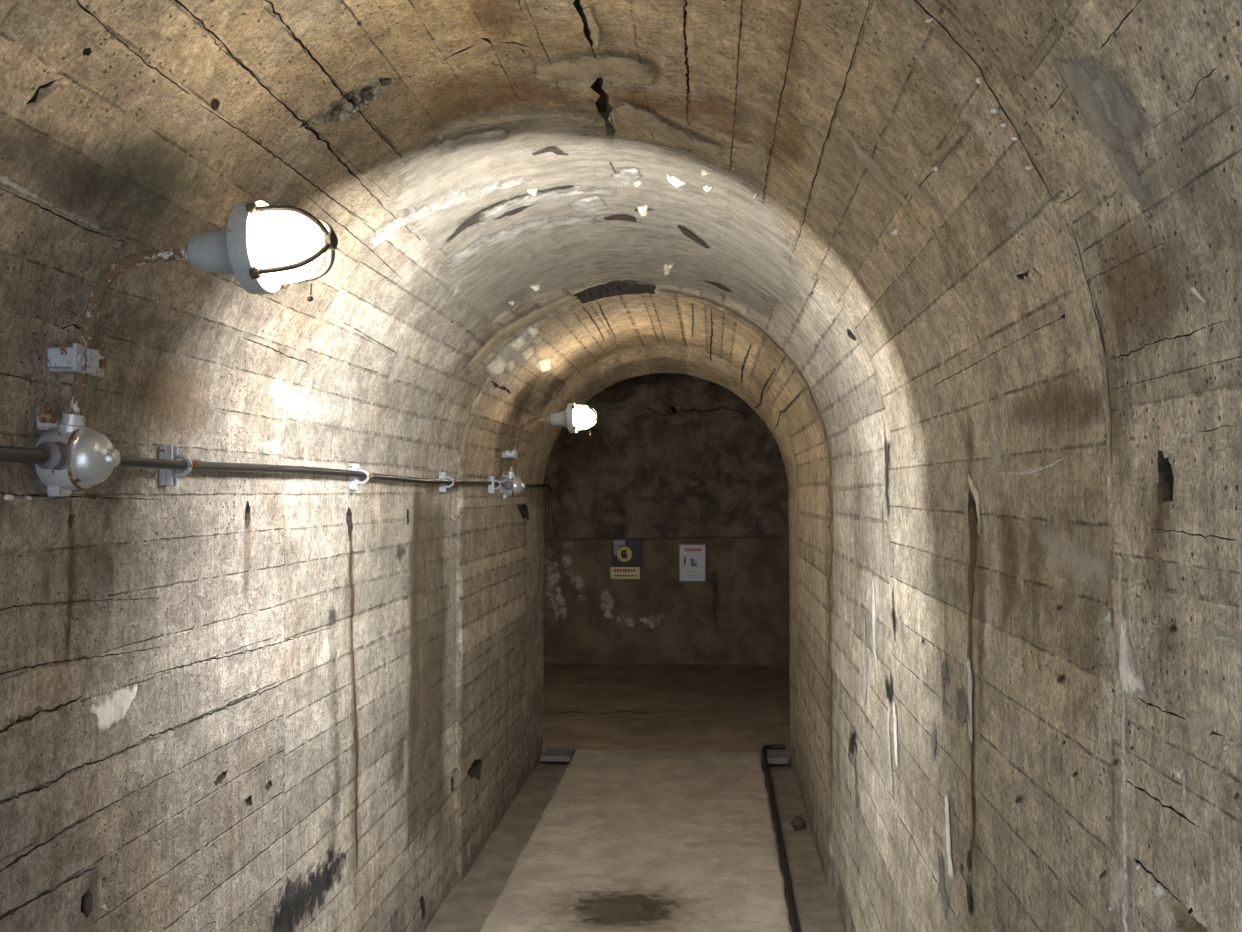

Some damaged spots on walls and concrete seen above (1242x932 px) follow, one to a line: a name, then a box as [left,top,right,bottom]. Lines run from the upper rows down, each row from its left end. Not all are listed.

crack [573,0,631,141]
corrosion [967,503,977,840]
water stain [575,892,675,926]